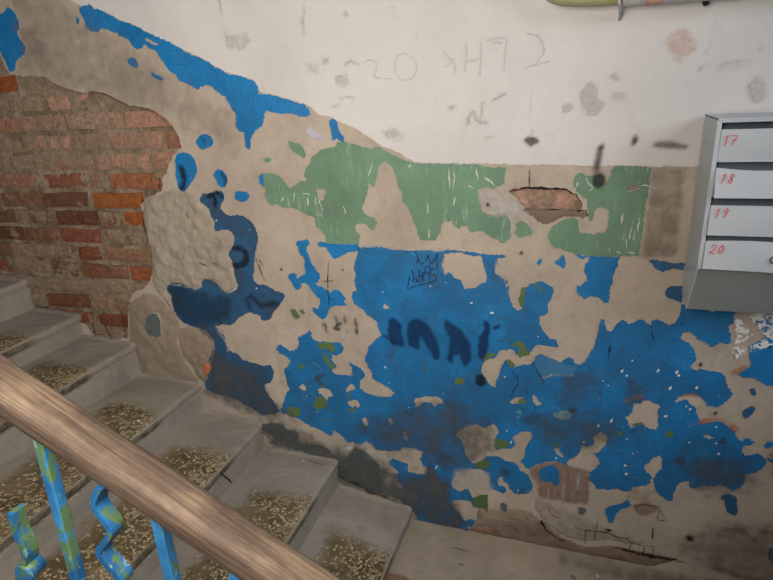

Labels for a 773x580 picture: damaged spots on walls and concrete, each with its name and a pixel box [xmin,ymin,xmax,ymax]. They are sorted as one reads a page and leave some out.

flaking render [0,4,311,416]
peeling [259,119,773,512]
crack [510,504,684,563]
peeling [605,500,632,523]